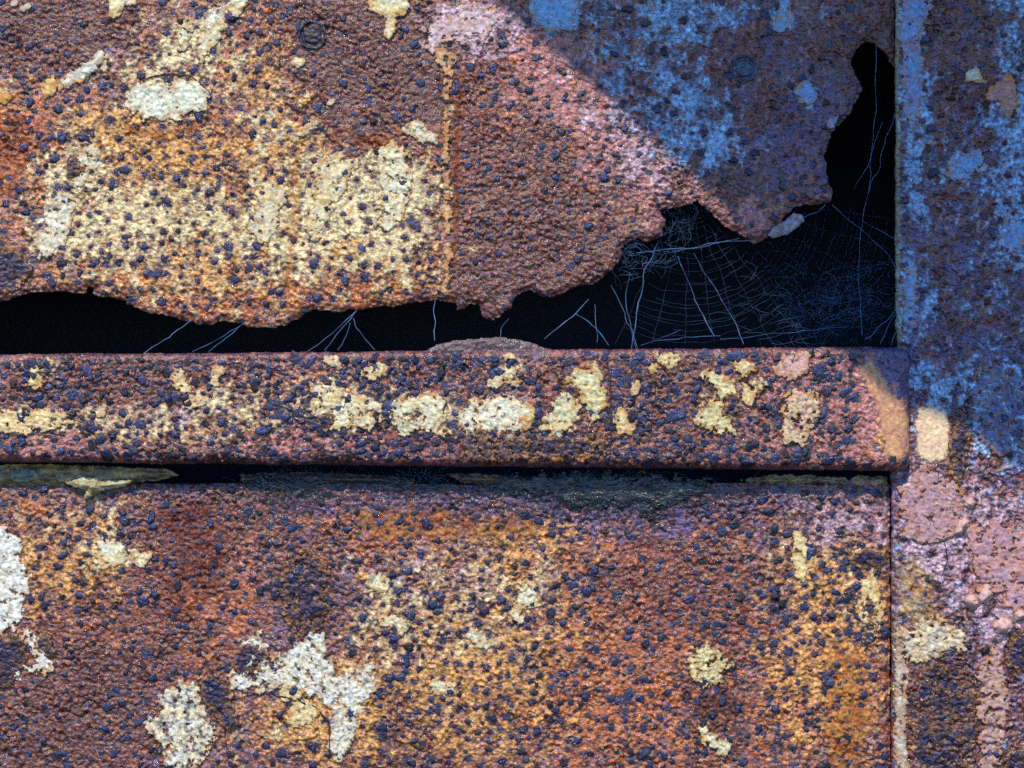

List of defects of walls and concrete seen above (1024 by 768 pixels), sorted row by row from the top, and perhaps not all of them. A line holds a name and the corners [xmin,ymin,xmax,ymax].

peeling [41,50,108,100]
peeling [124,79,211,123]
peeling [36,144,101,261]
peeling [247,183,287,244]
peeling [304,151,359,242]
peeling [373,119,439,232]
rust [0,0,834,325]
rust [721,81,855,239]
rust [0,337,920,472]
rust [940,419,984,488]
rust [0,484,961,768]
rust [899,655,1024,768]